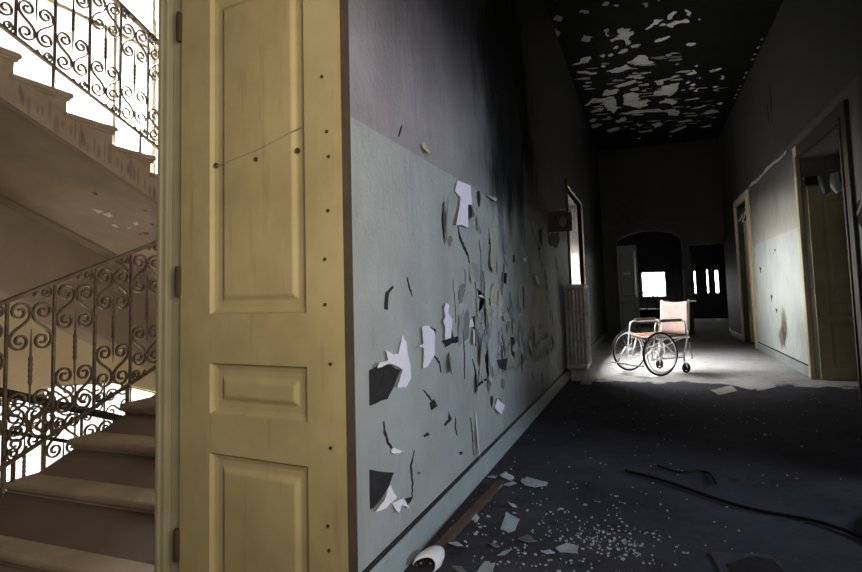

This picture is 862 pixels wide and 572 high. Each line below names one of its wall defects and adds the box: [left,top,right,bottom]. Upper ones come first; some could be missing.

flaking render [645,9,701,42]
flaking render [572,27,748,140]
peeling [419,180,561,414]
peeling [369,335,411,406]
peeling [383,421,402,454]
peeling [369,450,421,513]